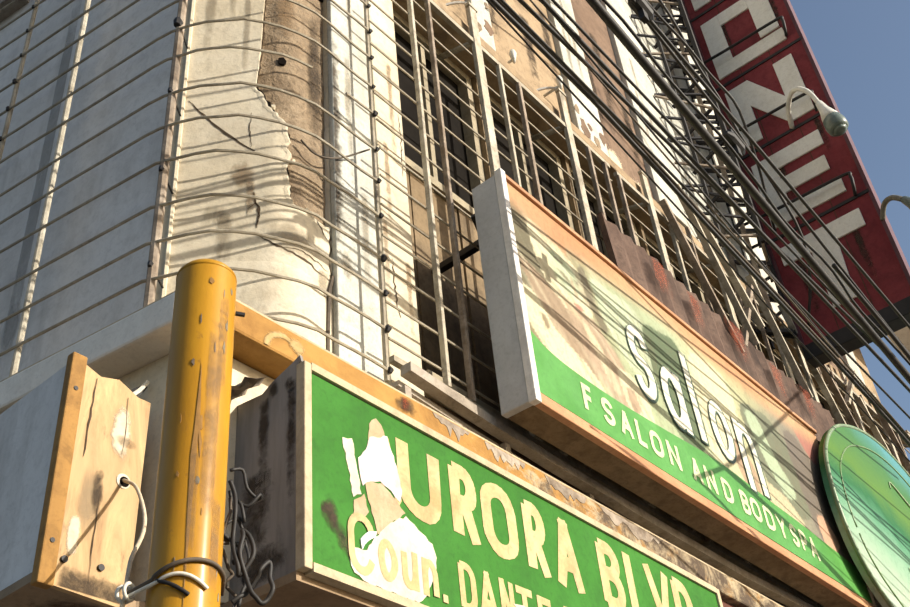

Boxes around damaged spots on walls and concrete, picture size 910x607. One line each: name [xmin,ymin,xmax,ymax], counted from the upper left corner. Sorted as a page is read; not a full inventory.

crack [189,0,275,151]
spalling [251,0,330,229]
crack [247,192,332,281]
peeling [433,412,470,442]
peeling [484,441,525,470]
peeling [544,474,587,503]
peeling [599,505,661,544]
damp [50,572,120,607]